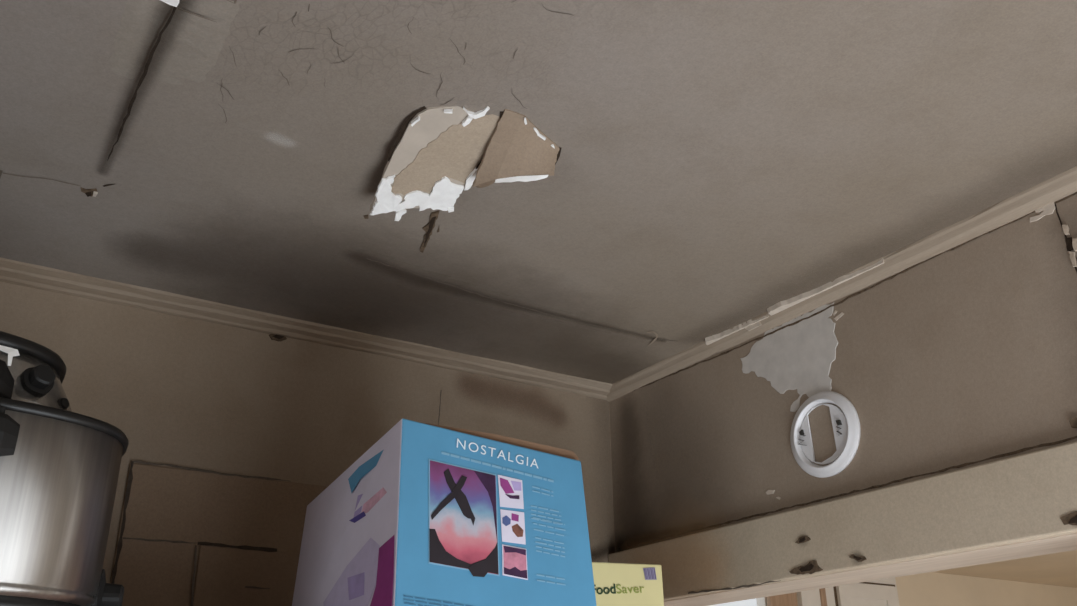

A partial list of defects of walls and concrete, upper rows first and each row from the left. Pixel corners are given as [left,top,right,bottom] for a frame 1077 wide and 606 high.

crack [107,0,237,161]
crack [281,4,354,88]
crack [410,39,466,105]
peeling [444,106,490,127]
peeling [464,168,478,190]
crack [1054,204,1077,272]
peeling [634,192,1077,412]
spalling [1060,511,1077,525]
spalling [789,560,823,575]